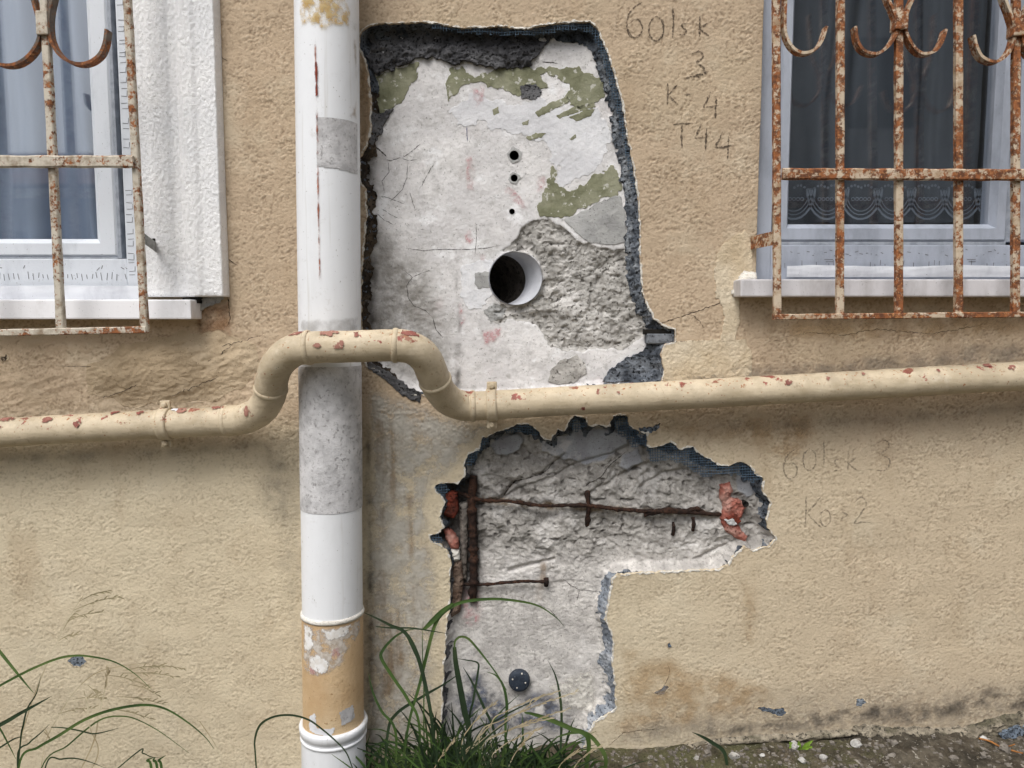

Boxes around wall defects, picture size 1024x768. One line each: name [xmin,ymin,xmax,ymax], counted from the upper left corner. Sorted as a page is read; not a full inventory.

crack [376,145,433,224]
spalling [312,19,676,396]
spalling [428,407,777,755]
spalling [757,706,788,717]